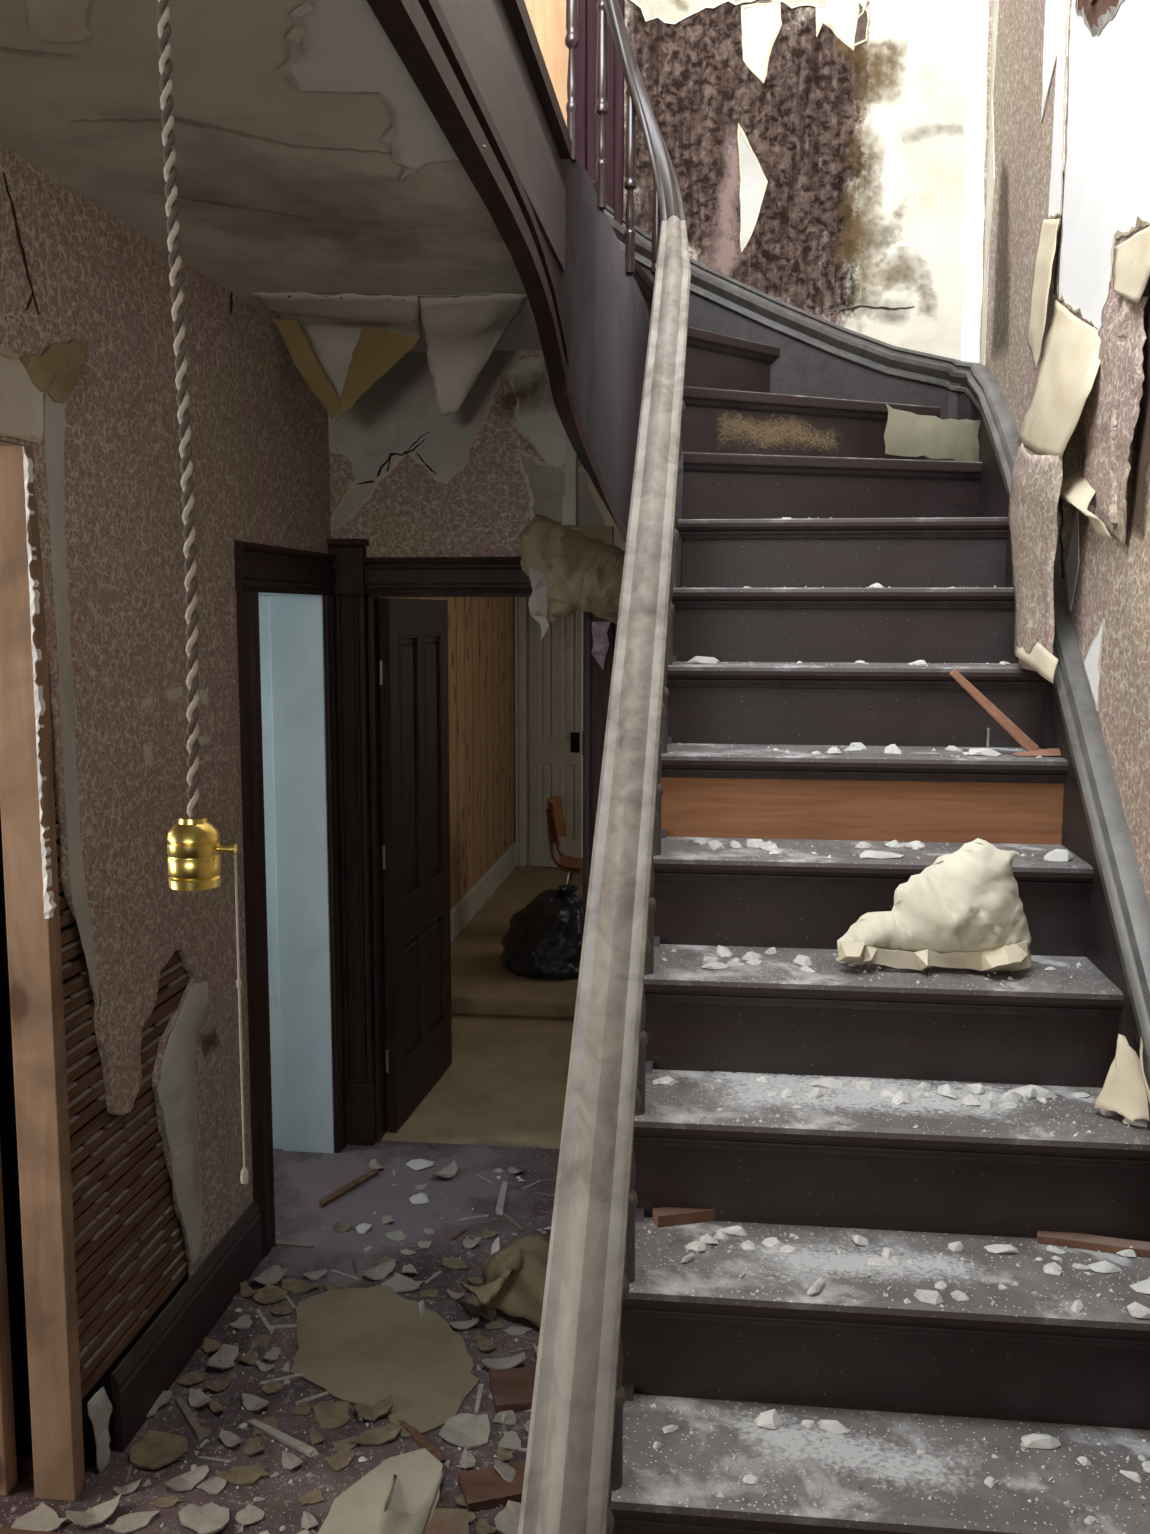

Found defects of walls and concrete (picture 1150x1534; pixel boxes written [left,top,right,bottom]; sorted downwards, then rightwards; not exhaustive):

crack [3,173,39,315]
leakage [624,0,897,322]
leakage [886,258,911,282]
flaking render [1027,0,1150,371]
crack [358,432,437,484]
flaking render [328,293,566,531]
peeling [586,472,626,550]
peeling [1059,470,1111,612]
flaking render [1082,619,1105,712]
flaking render [0,348,211,1473]